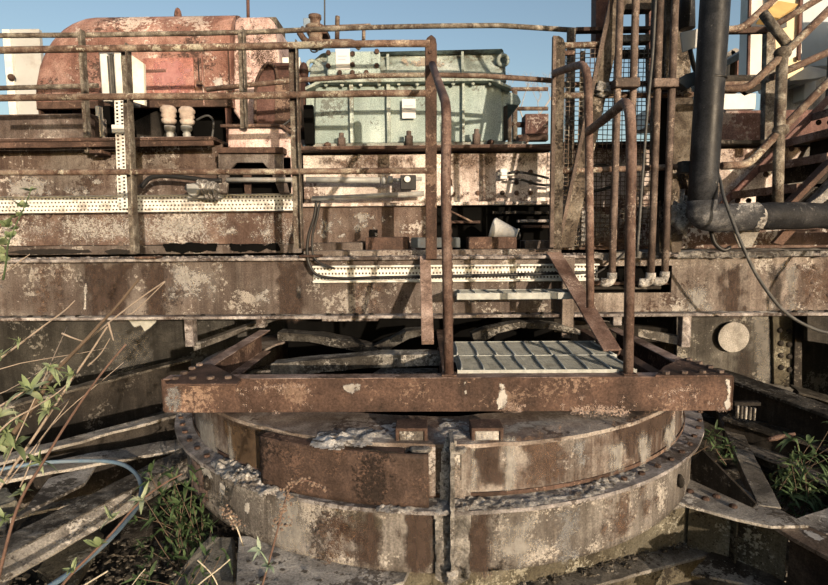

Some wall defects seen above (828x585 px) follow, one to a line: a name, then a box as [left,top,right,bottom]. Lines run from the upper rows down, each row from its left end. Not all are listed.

corrosion [233,22,278,69]
corrosion [451,151,550,200]
corrosion [9,249,168,321]
corrosion [276,261,304,322]
corrosion [718,266,746,319]
corrosion [785,257,828,310]
corrosion [224,418,264,469]